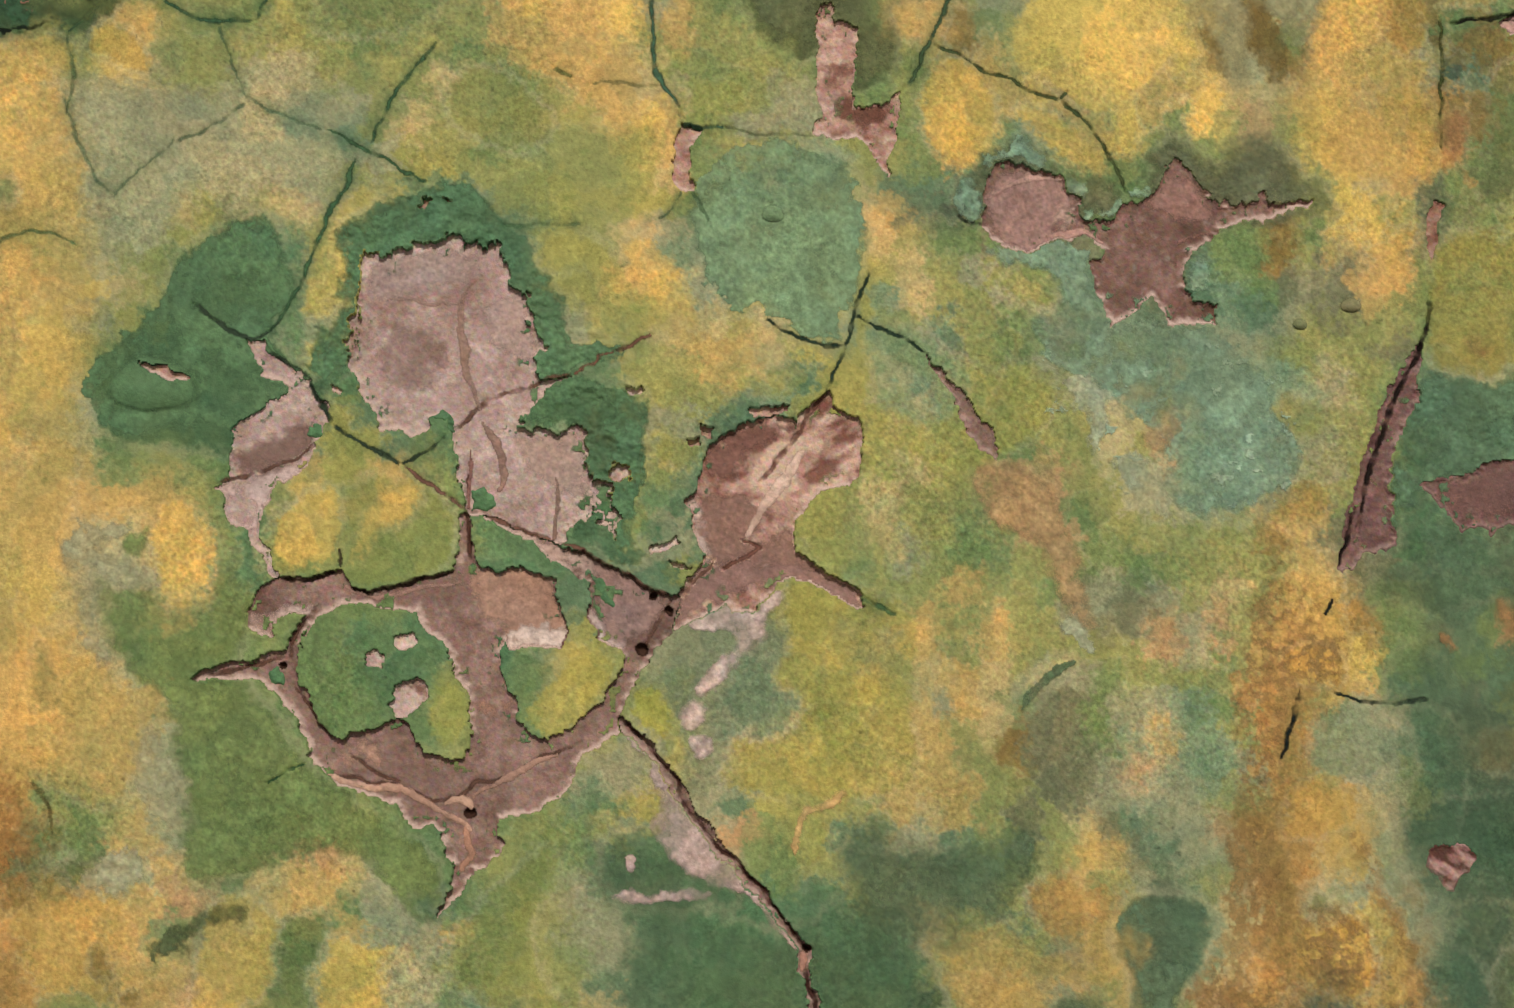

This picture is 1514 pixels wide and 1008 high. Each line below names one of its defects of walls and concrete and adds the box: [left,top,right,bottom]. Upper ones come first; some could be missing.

crack [606,0,723,131]
peeling [812,3,901,177]
crack [908,0,1125,187]
peeling [981,158,1313,328]
crack [198,55,762,645]
crack [764,274,924,478]
peeling [1337,344,1422,573]
peeling [1420,460,1514,537]
crack [213,619,500,803]
peeling [192,233,865,1008]
crack [626,722,818,1008]
peeling [1426,843,1477,892]